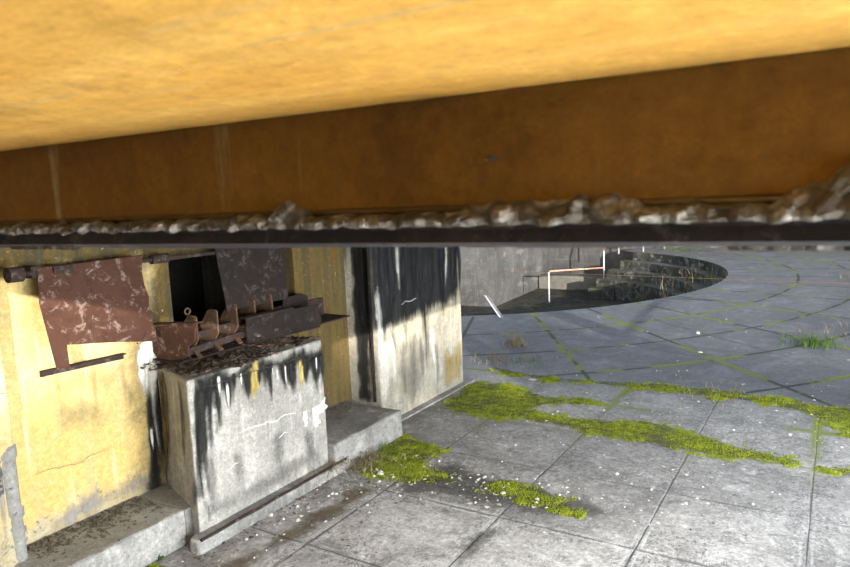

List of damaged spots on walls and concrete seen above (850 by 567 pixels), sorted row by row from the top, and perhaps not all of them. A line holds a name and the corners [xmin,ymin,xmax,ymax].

spalling [0,164,850,316]
leakage [351,246,461,402]
leakage [138,341,170,490]
leakage [192,349,324,504]